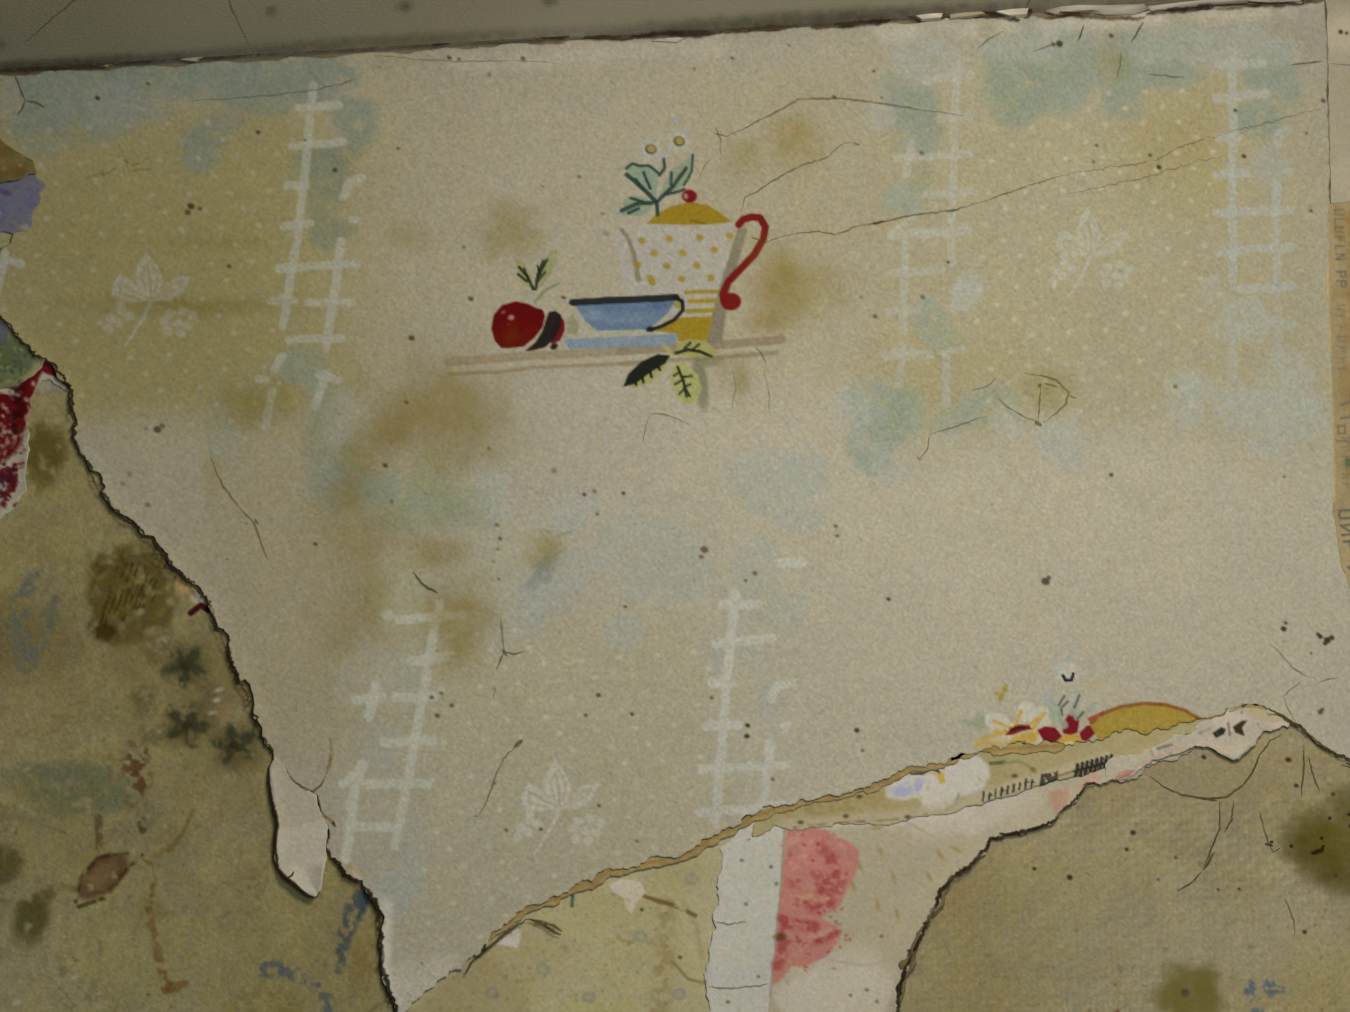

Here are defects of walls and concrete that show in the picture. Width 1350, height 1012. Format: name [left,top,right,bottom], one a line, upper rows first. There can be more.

peeling [0,379,734,1012]
peeling [895,715,1350,1012]
damp [1270,813,1350,883]